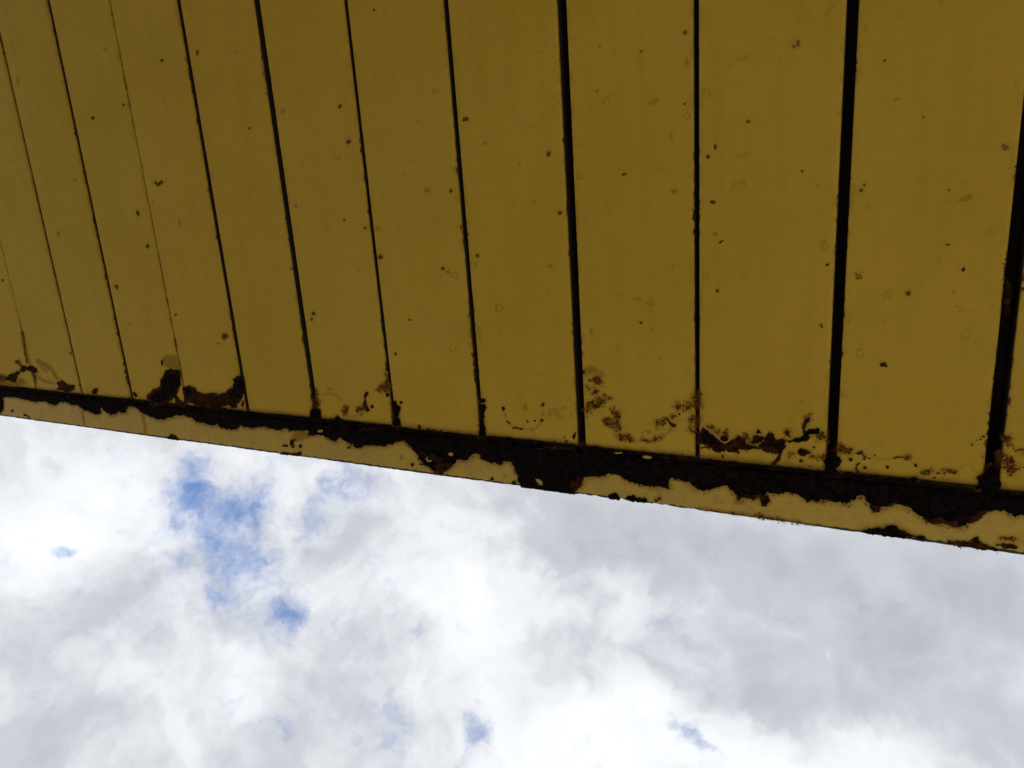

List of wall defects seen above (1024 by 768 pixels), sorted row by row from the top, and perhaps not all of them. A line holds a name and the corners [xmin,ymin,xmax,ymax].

corrosion [0,330,1024,553]